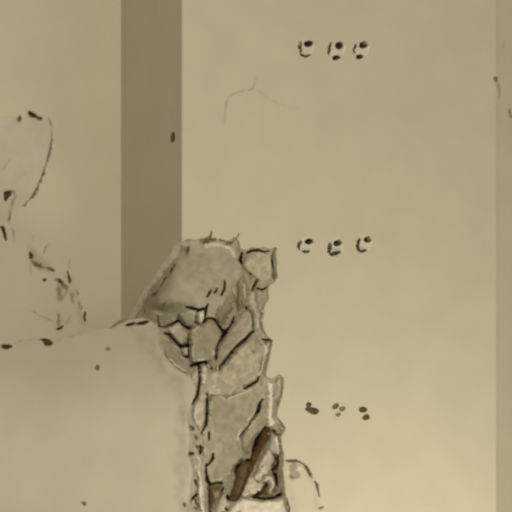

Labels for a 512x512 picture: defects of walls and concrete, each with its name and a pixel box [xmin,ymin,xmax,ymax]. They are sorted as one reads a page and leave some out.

crack [0,225,8,241]
crack [29,251,71,286]
crack [125,319,150,327]
spalling [128,231,288,512]